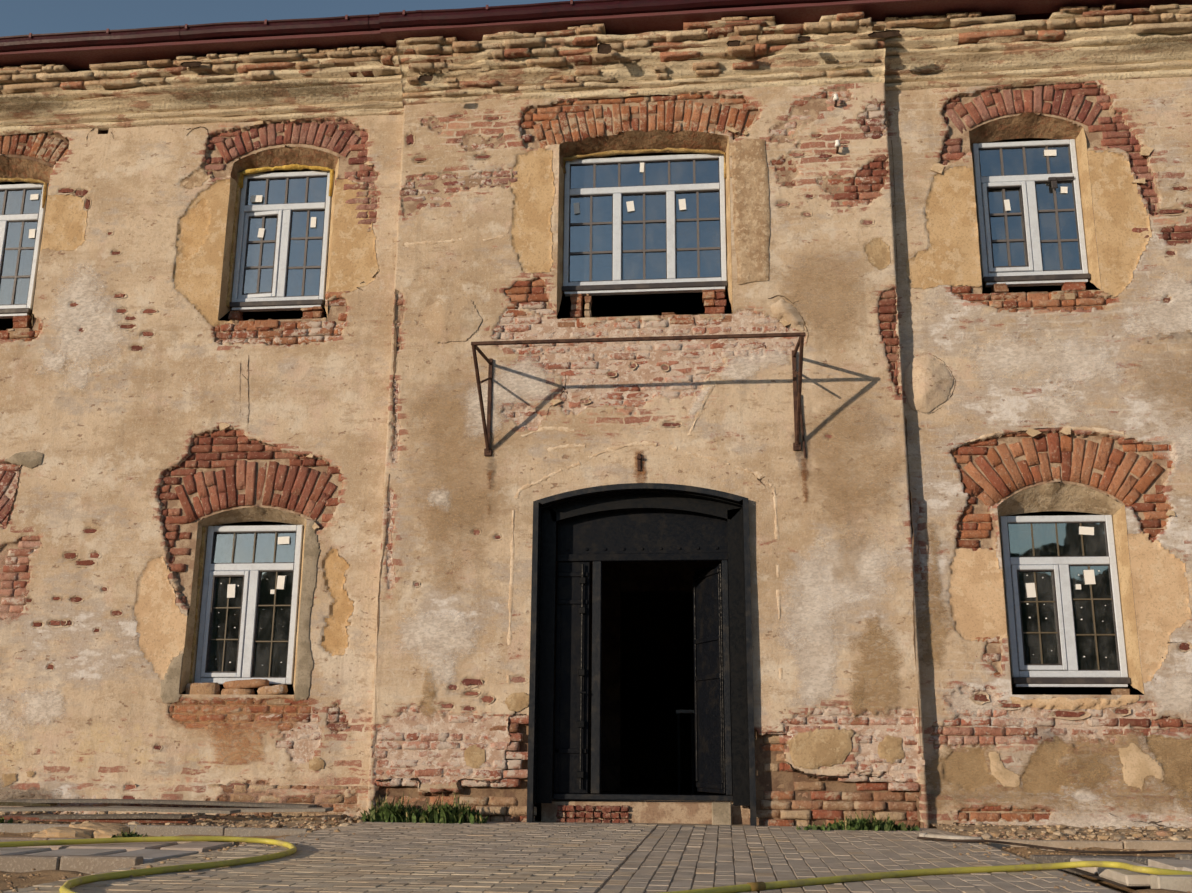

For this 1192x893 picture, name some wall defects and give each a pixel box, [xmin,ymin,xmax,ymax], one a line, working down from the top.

flaking render [172,117,379,347]
flaking render [401,86,891,453]
damp [974,336,1116,380]
damp [1129,274,1192,337]
damp [1151,370,1192,464]
flaking render [0,461,42,620]
flaking render [110,423,344,680]
flaking render [749,425,1192,828]
damp [0,692,63,734]
flaking render [203,678,537,822]
damp [949,690,1033,736]
damp [925,733,1192,829]